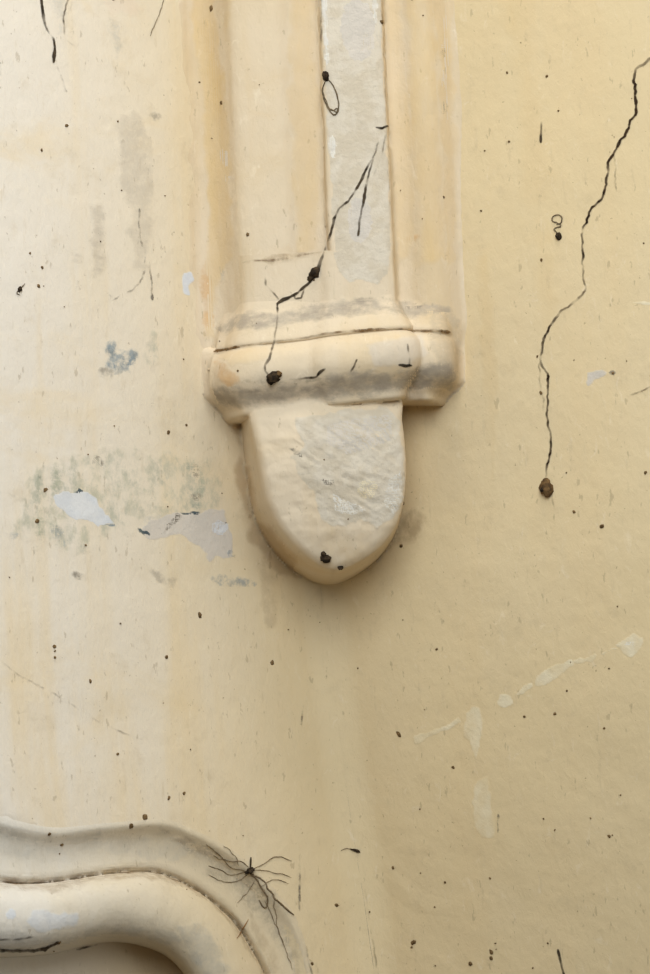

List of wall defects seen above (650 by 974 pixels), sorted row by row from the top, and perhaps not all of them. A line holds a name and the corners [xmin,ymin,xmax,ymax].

crack [40,0,66,63]
crack [581,62,646,259]
crack [274,166,371,311]
crack [335,327,451,335]
crack [305,369,325,379]
crack [541,291,585,468]
peeling [53,488,115,527]
peeling [137,508,235,563]